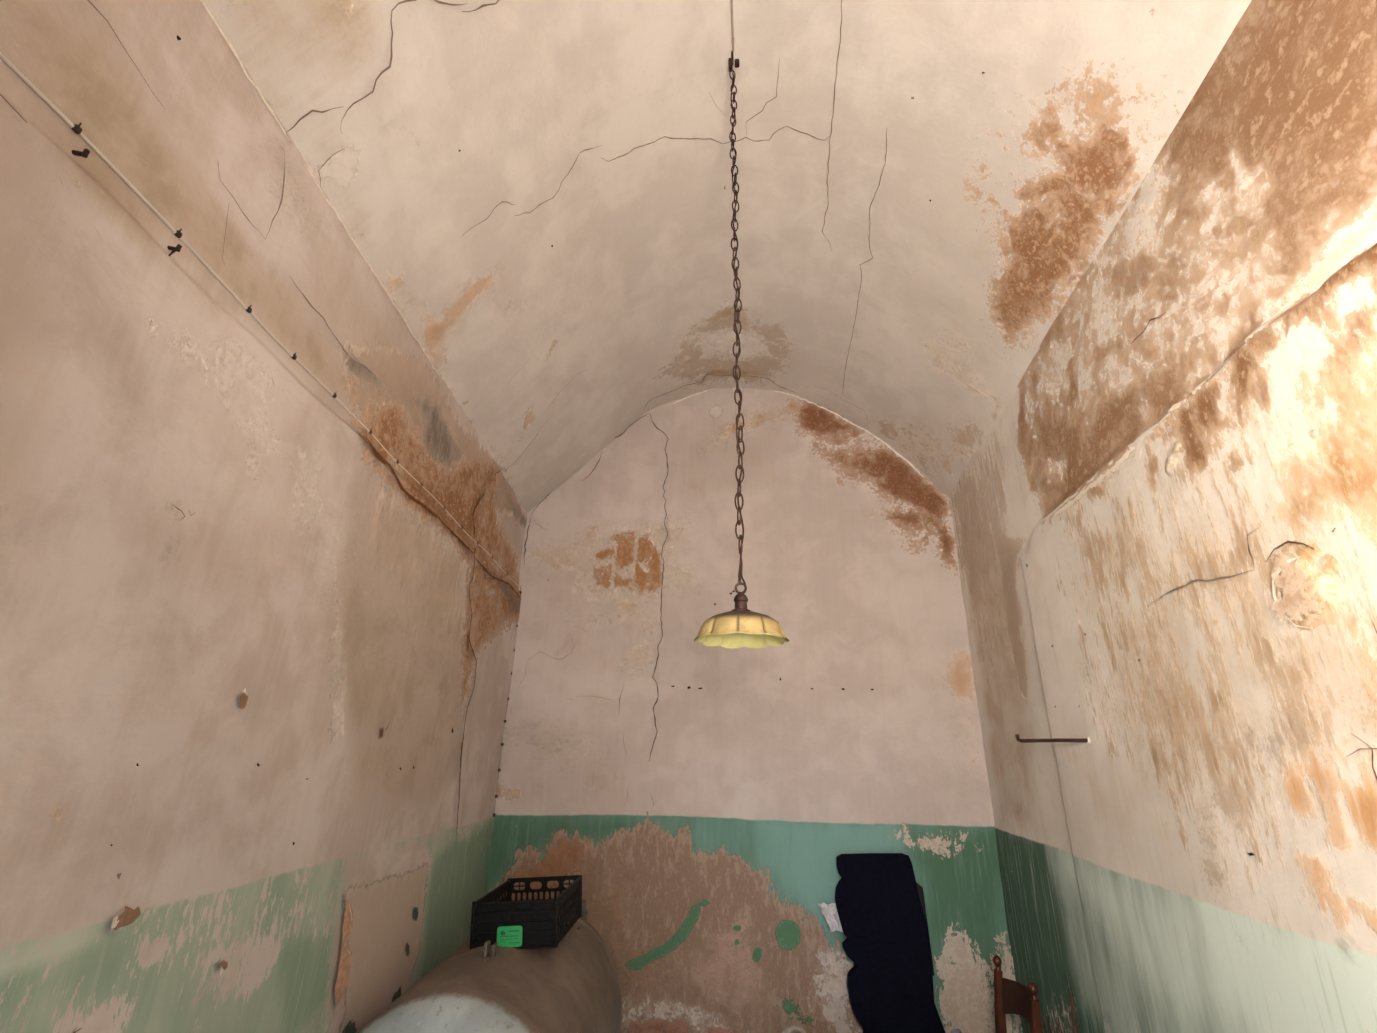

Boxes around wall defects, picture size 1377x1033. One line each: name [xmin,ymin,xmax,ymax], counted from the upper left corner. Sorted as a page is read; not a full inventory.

crack [468,0,842,246]
damp [342,350,382,386]
damp [415,395,464,468]
crack [366,376,575,833]
crack [567,130,887,809]
damp [955,445,1024,688]
damp [1017,0,1377,893]
peeling [490,813,863,1033]
peeling [884,822,984,862]
peeling [934,921,1023,1033]